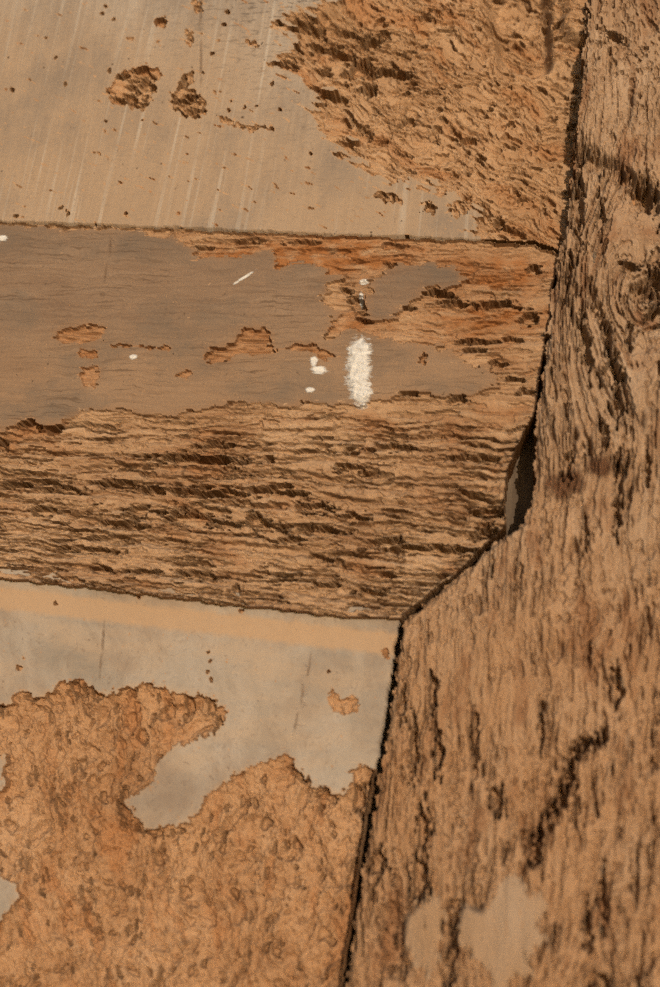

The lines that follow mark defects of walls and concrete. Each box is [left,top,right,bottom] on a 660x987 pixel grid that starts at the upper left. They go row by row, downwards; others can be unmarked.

spalling [0,0,591,628]
spalling [0,651,379,987]